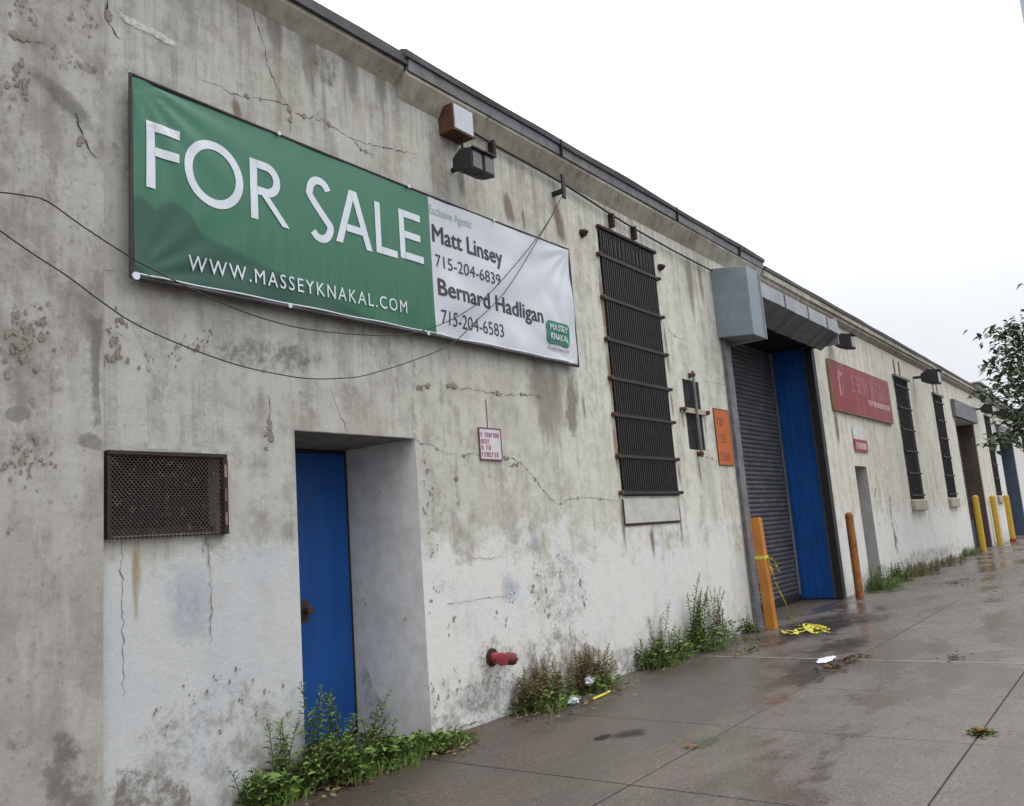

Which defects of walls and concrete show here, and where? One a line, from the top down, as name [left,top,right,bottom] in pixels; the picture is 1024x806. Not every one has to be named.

spalling [0,57,31,116]
crack [202,12,416,154]
crack [75,113,97,158]
spalling [0,302,63,379]
peeling [104,306,154,372]
crack [417,382,541,398]
spalling [0,433,57,491]
crack [417,440,618,512]
crack [118,541,126,696]
crack [203,537,213,653]